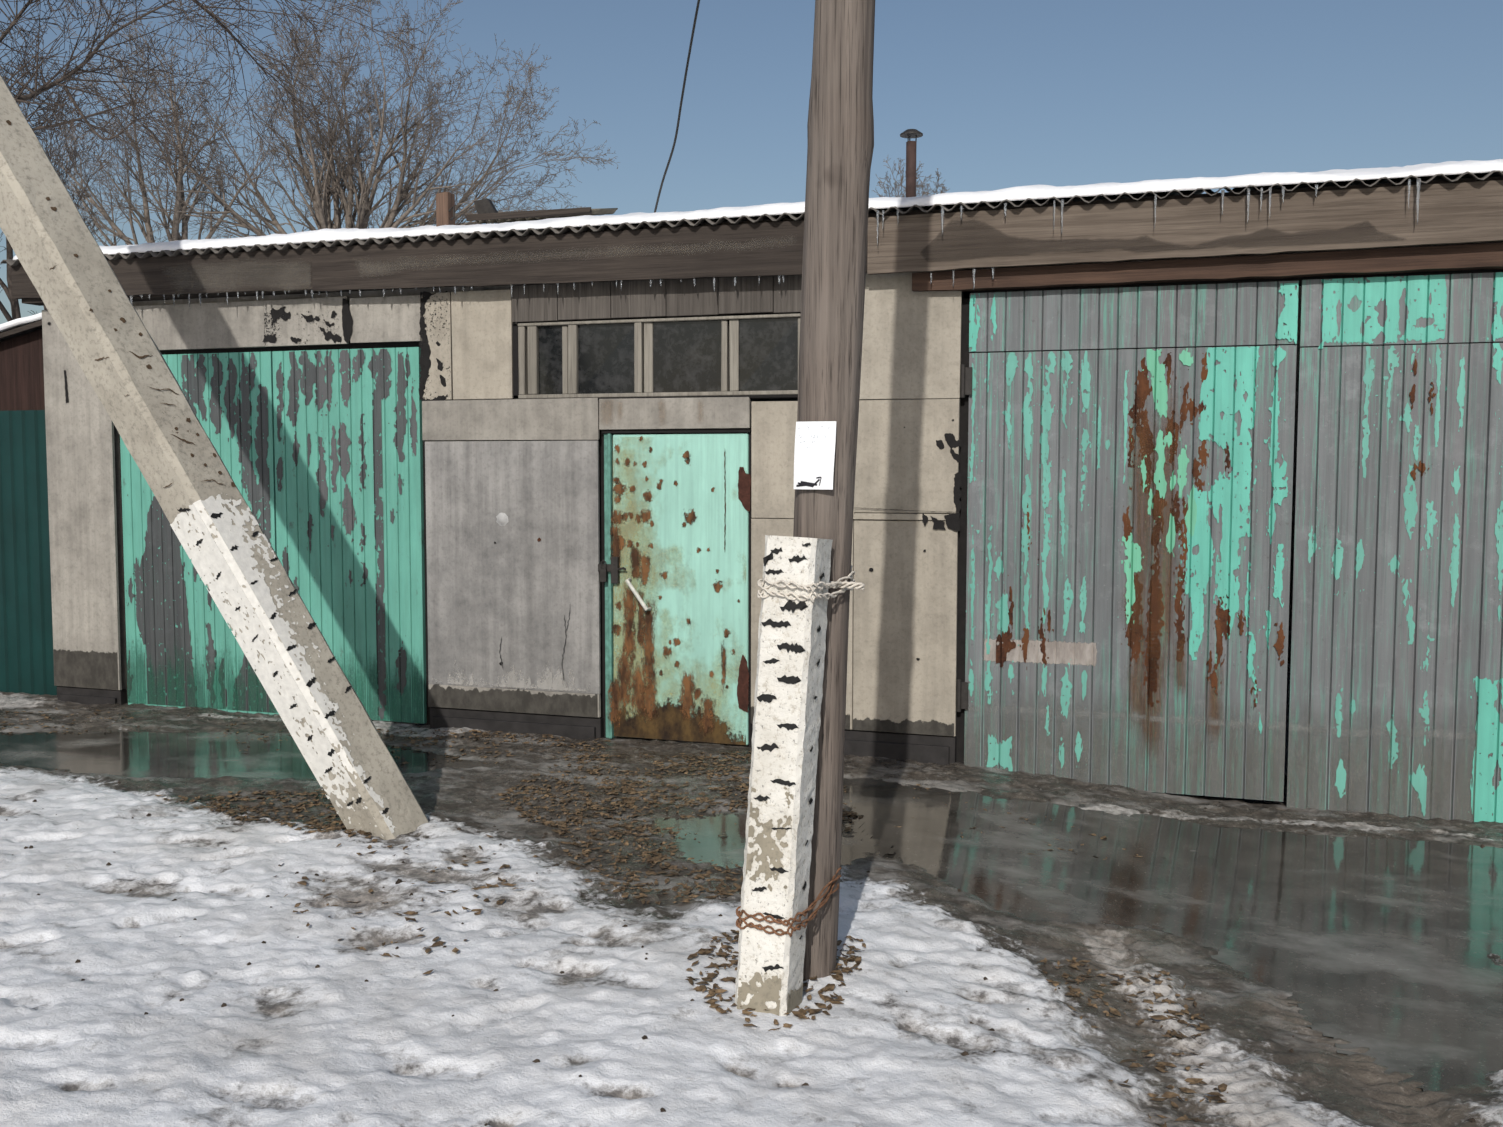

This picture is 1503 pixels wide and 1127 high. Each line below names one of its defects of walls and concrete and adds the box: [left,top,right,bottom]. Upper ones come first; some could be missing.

peeling [1487,272,1503,384]
peeling [123,291,451,837]
rust [607,436,749,745]
rust [738,467,751,512]
peeling [922,283,1299,777]
rust [1122,352,1231,735]
rust [1206,594,1247,727]
rust [1264,610,1285,666]
peeling [1308,507,1435,671]
peeling [1318,274,1466,607]
peeling [1386,715,1427,816]
peeling [1470,676,1503,823]